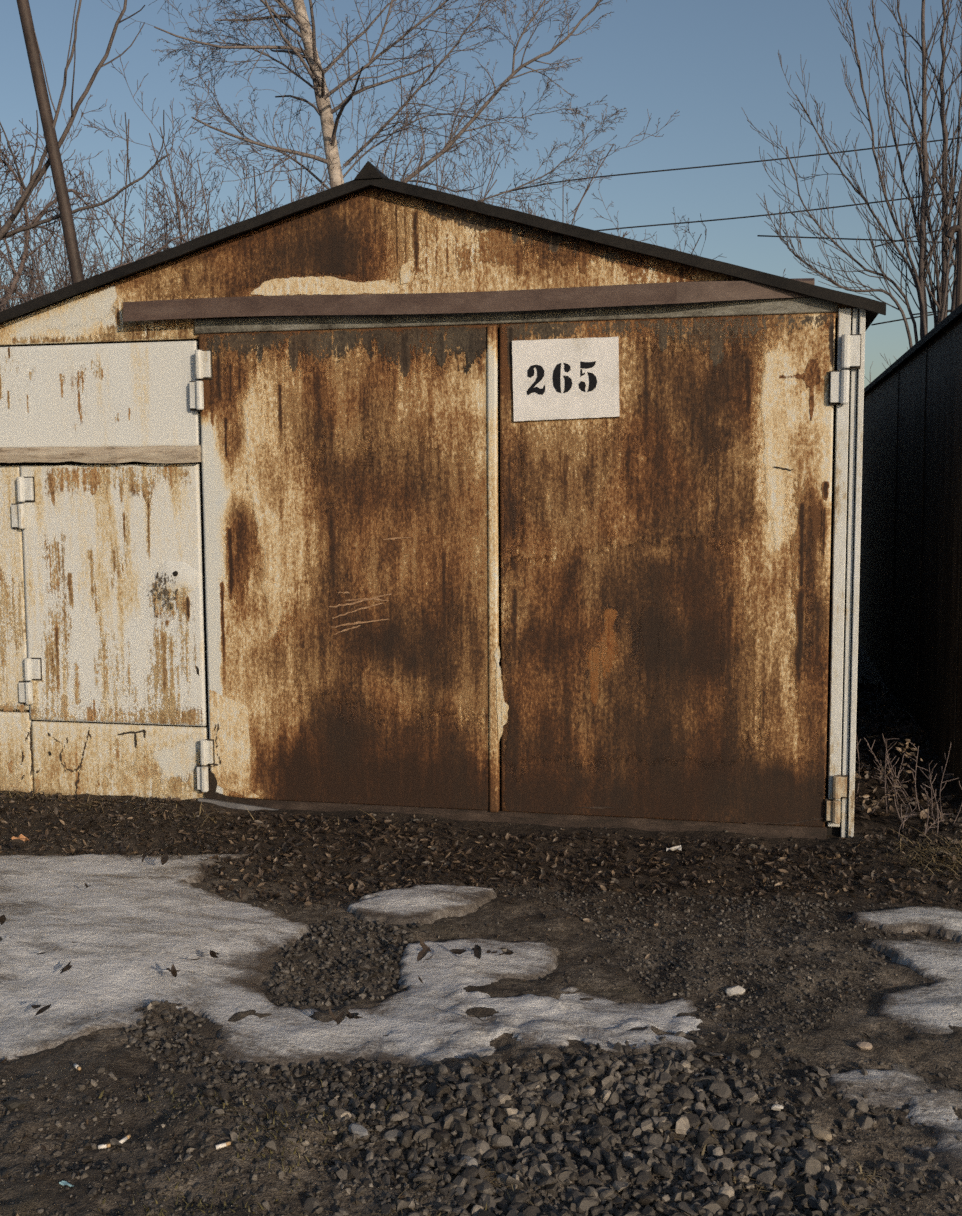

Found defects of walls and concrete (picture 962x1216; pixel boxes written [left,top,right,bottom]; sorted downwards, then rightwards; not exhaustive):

rust [148,191,603,299]
rust [618,260,694,284]
rust [0,299,830,826]
peeling [494,646,509,740]